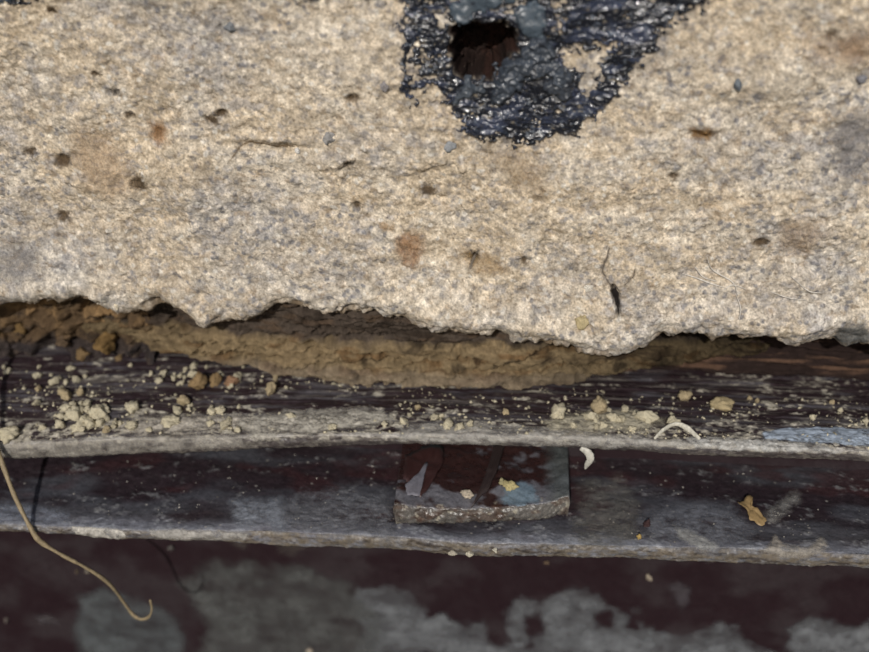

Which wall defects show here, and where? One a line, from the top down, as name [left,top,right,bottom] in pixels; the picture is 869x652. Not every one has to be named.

spalling [0,296,155,366]
spalling [652,336,869,380]
damp [75,590,182,652]
damp [188,564,755,652]
damp [789,620,869,652]